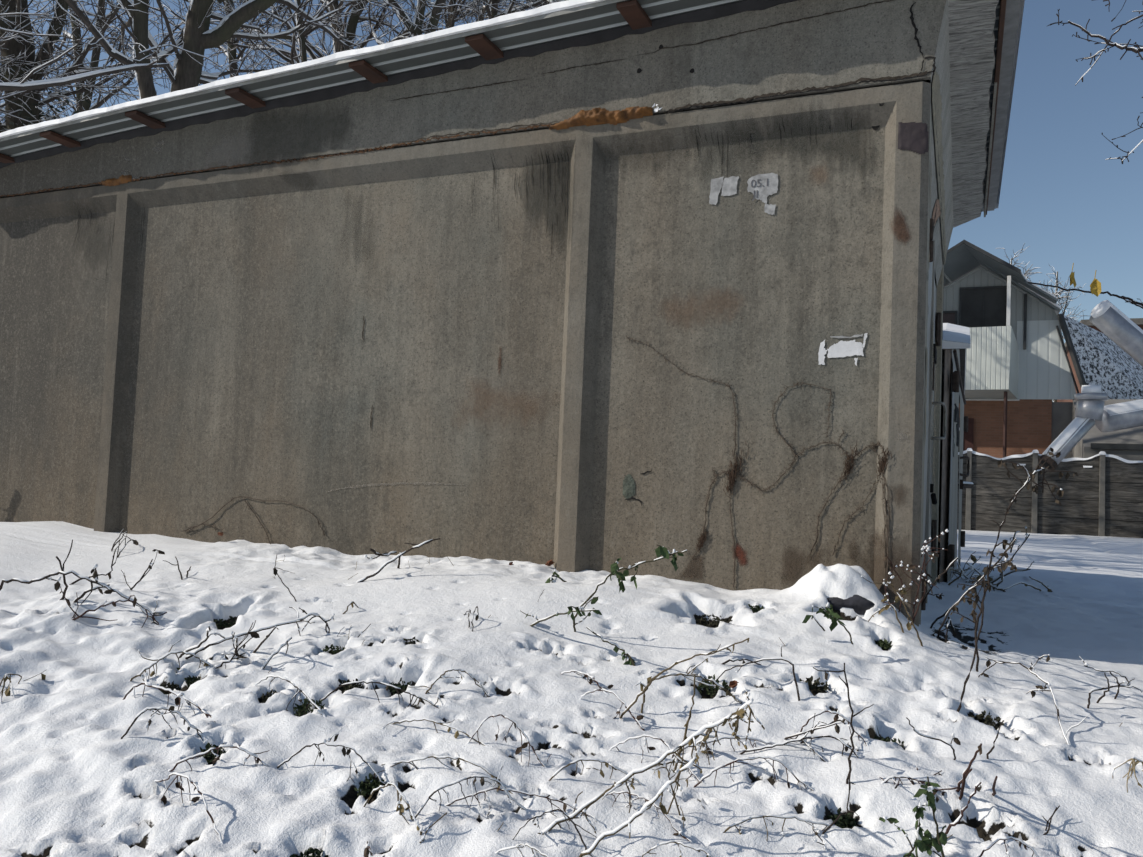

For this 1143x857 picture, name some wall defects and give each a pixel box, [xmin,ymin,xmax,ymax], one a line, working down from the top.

crack [390,0,936,113]
damp [511,151,569,269]